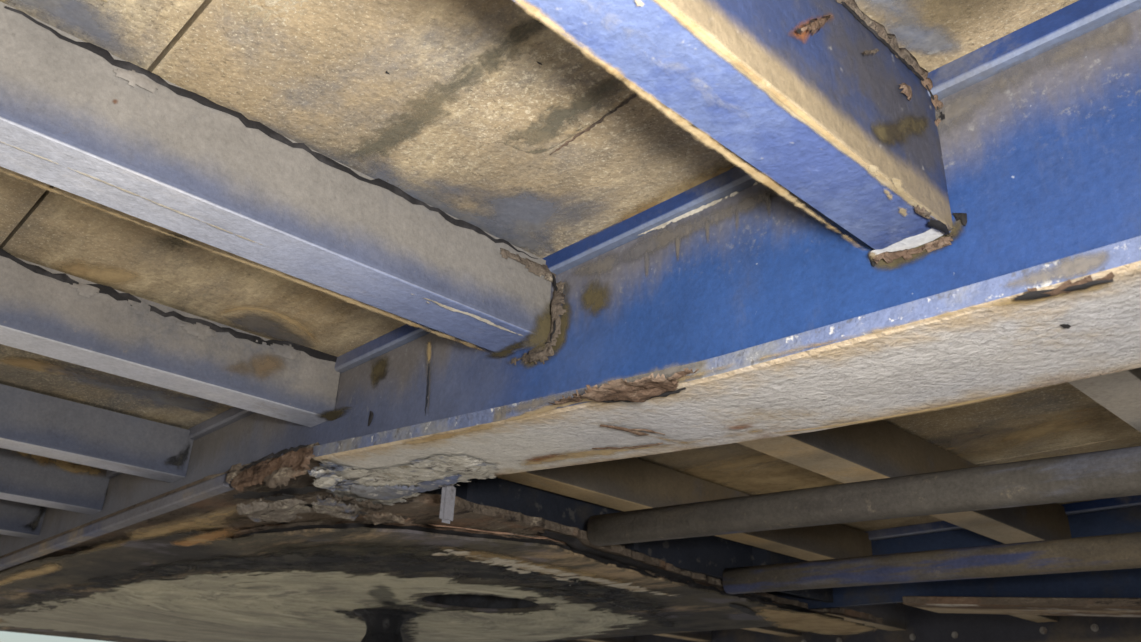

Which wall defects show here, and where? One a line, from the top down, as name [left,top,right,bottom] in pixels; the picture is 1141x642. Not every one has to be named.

crack [550,90,644,155]
rust [516,0,852,241]
rust [870,213,967,269]
rust [79,201,570,367]
rust [582,283,608,313]
peeling [235,455,498,525]
water stain [0,565,59,585]